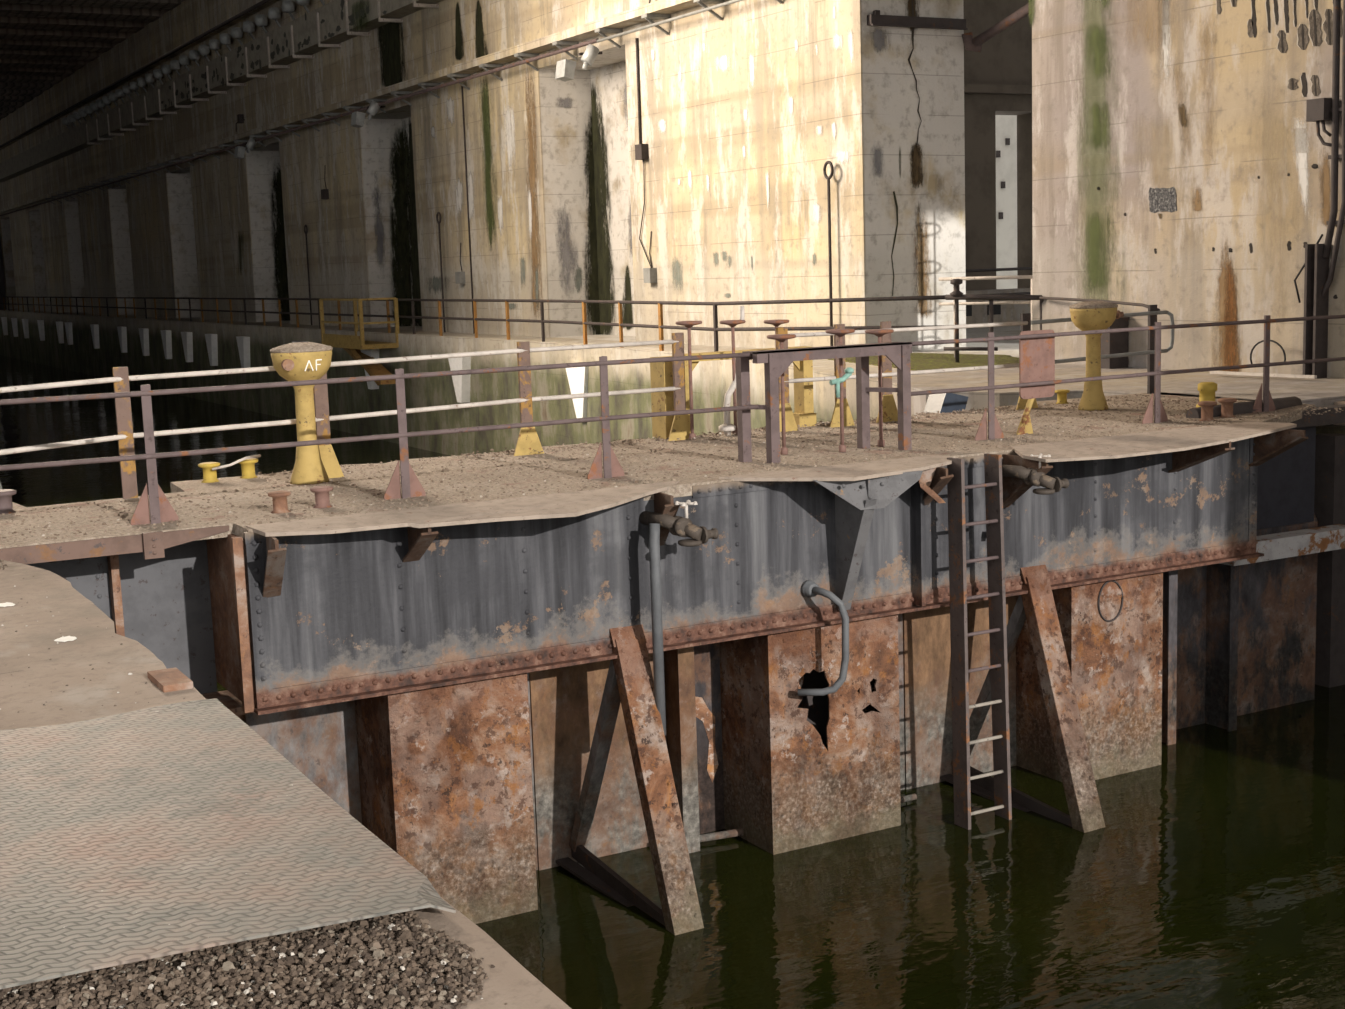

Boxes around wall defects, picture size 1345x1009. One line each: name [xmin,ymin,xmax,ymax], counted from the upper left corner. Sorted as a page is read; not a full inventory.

water stain [1089,28,1106,75]
water stain [403,123,446,326]
water stain [456,86,503,242]
water stain [506,77,542,315]
water stain [558,214,582,291]
water stain [1088,216,1108,286]
corrosion [1216,243,1240,372]